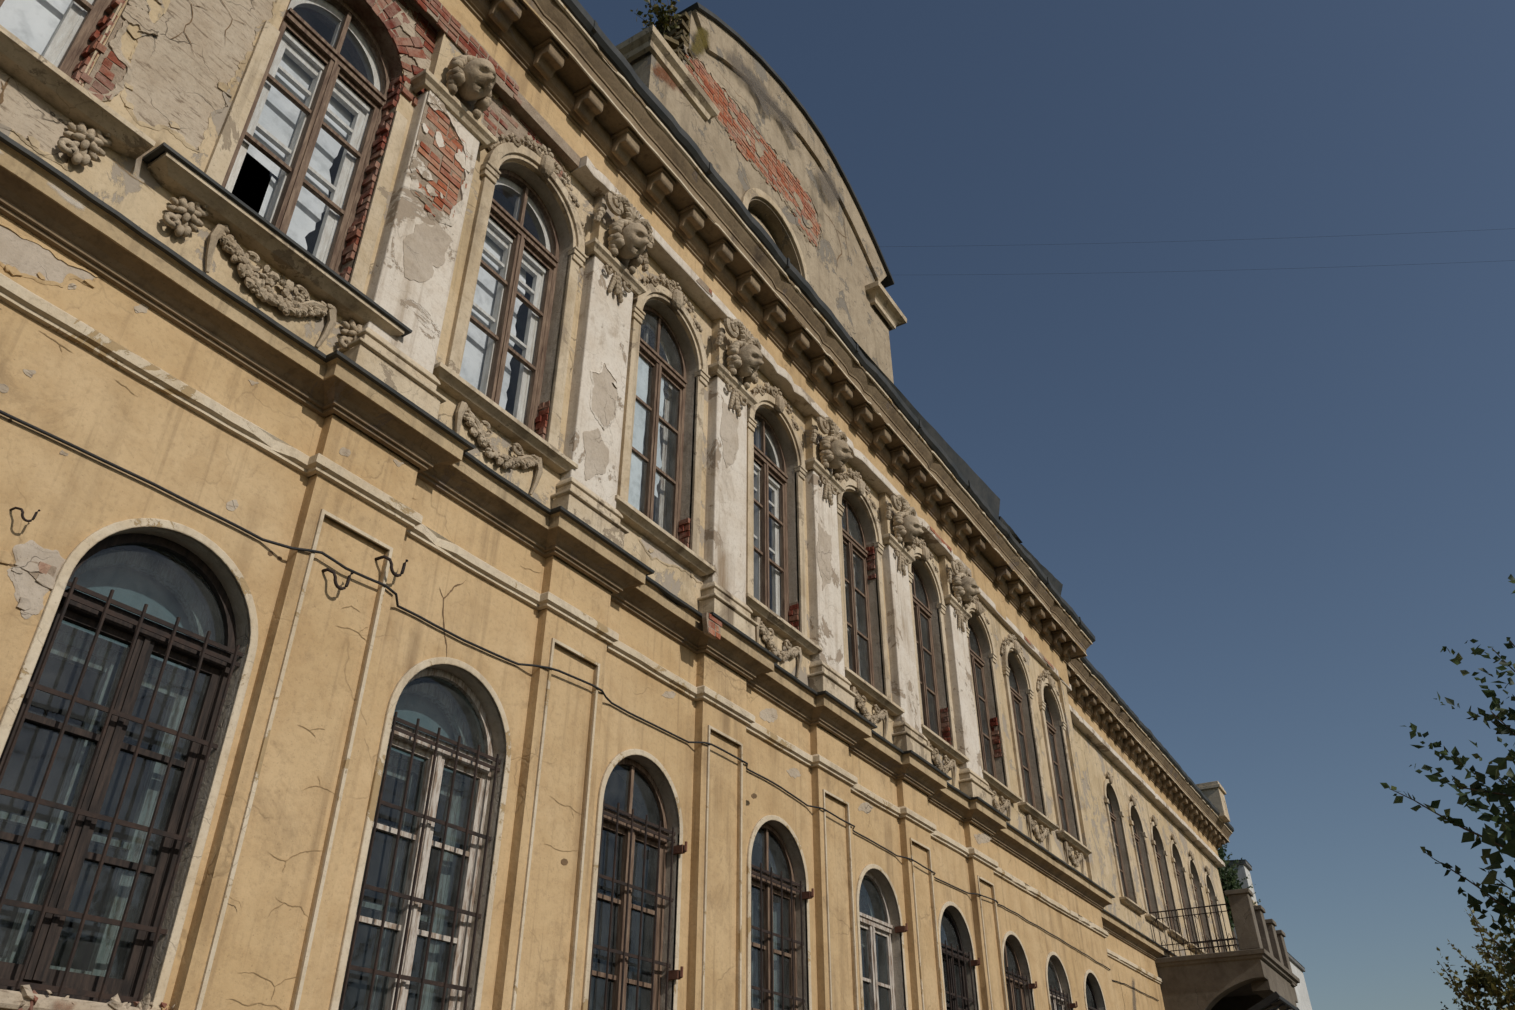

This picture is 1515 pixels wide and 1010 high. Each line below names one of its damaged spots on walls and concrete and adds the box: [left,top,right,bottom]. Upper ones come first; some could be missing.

crack [0,78,10,104]
peeling [0,68,74,171]
peeling [71,0,278,153]
flaking render [340,0,571,282]
peeling [654,66,676,88]
flaking render [663,11,822,250]
peeling [0,222,98,290]
peeling [583,361,620,480]
spalling [7,540,66,619]